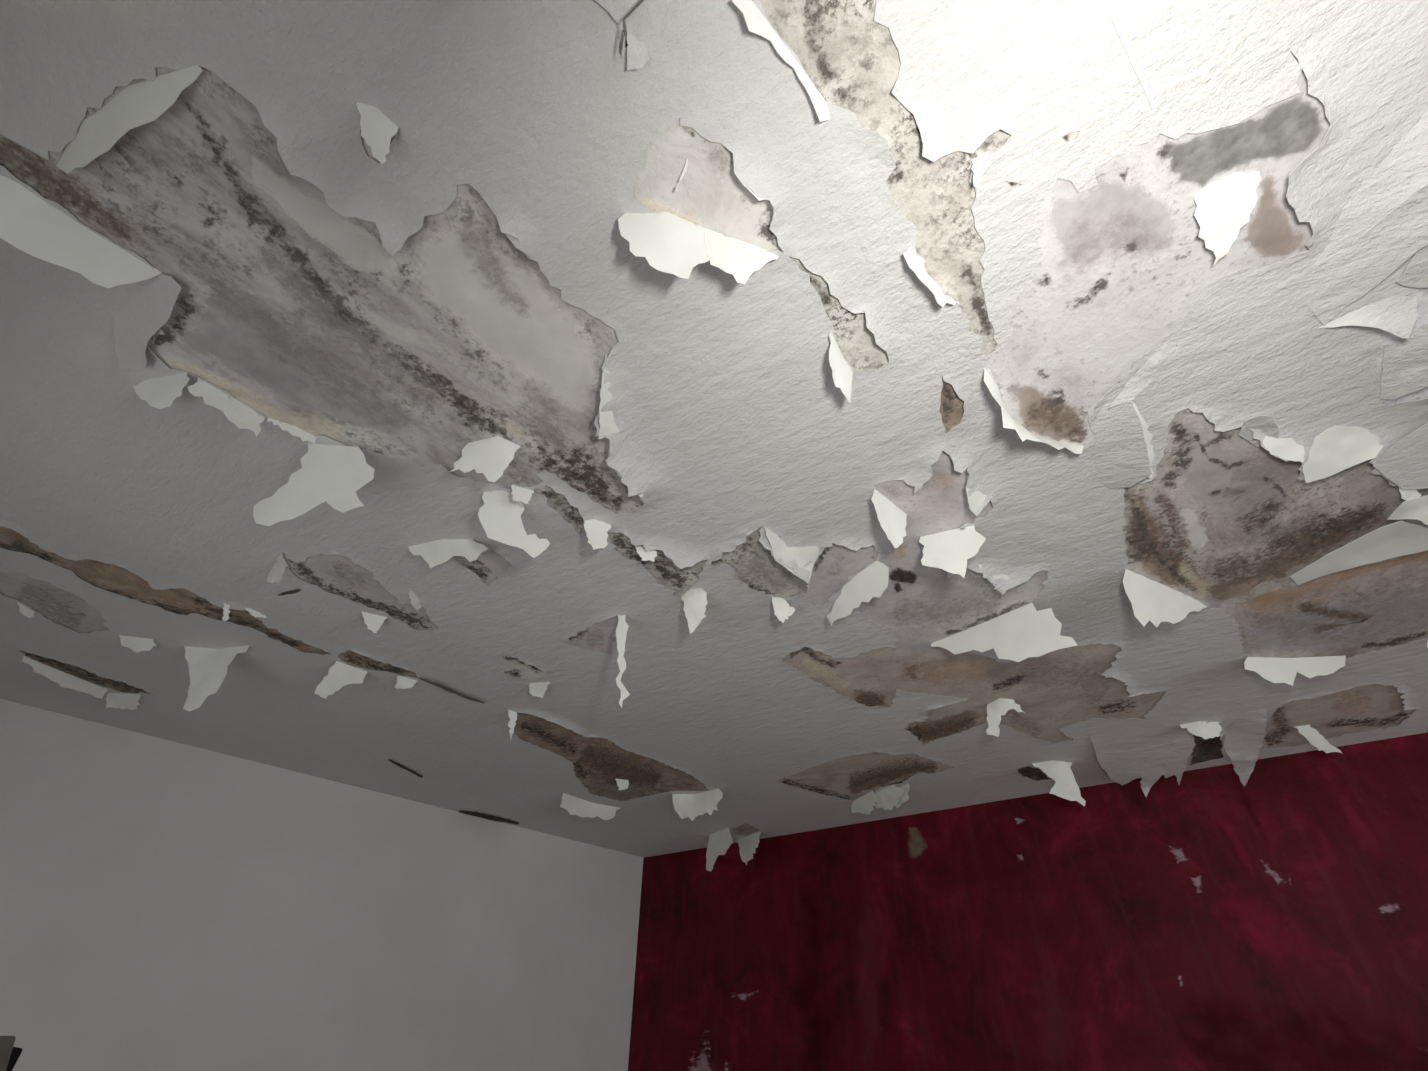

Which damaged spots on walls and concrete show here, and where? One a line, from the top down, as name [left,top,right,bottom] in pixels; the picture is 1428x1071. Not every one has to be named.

peeling [0,0,1428,821]
peeling [706,823,761,871]